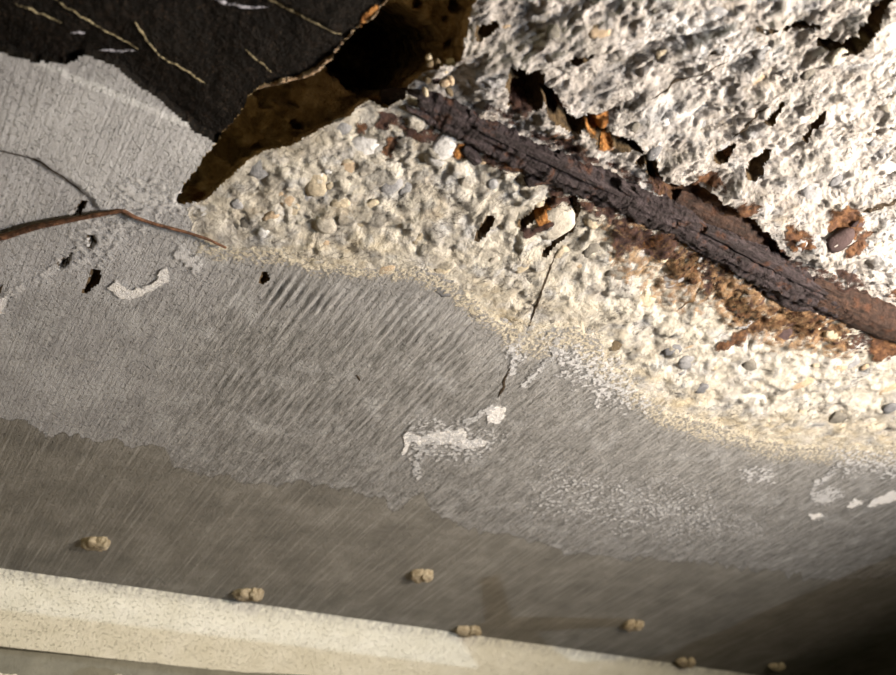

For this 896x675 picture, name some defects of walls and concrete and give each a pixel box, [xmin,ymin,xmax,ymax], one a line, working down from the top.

crack [651,0,894,100]
leakage [0,177,206,316]
crack [498,257,555,397]
leakage [173,243,896,521]
spalling [187,0,896,453]
corrosion [356,77,896,364]
leakage [0,418,896,675]